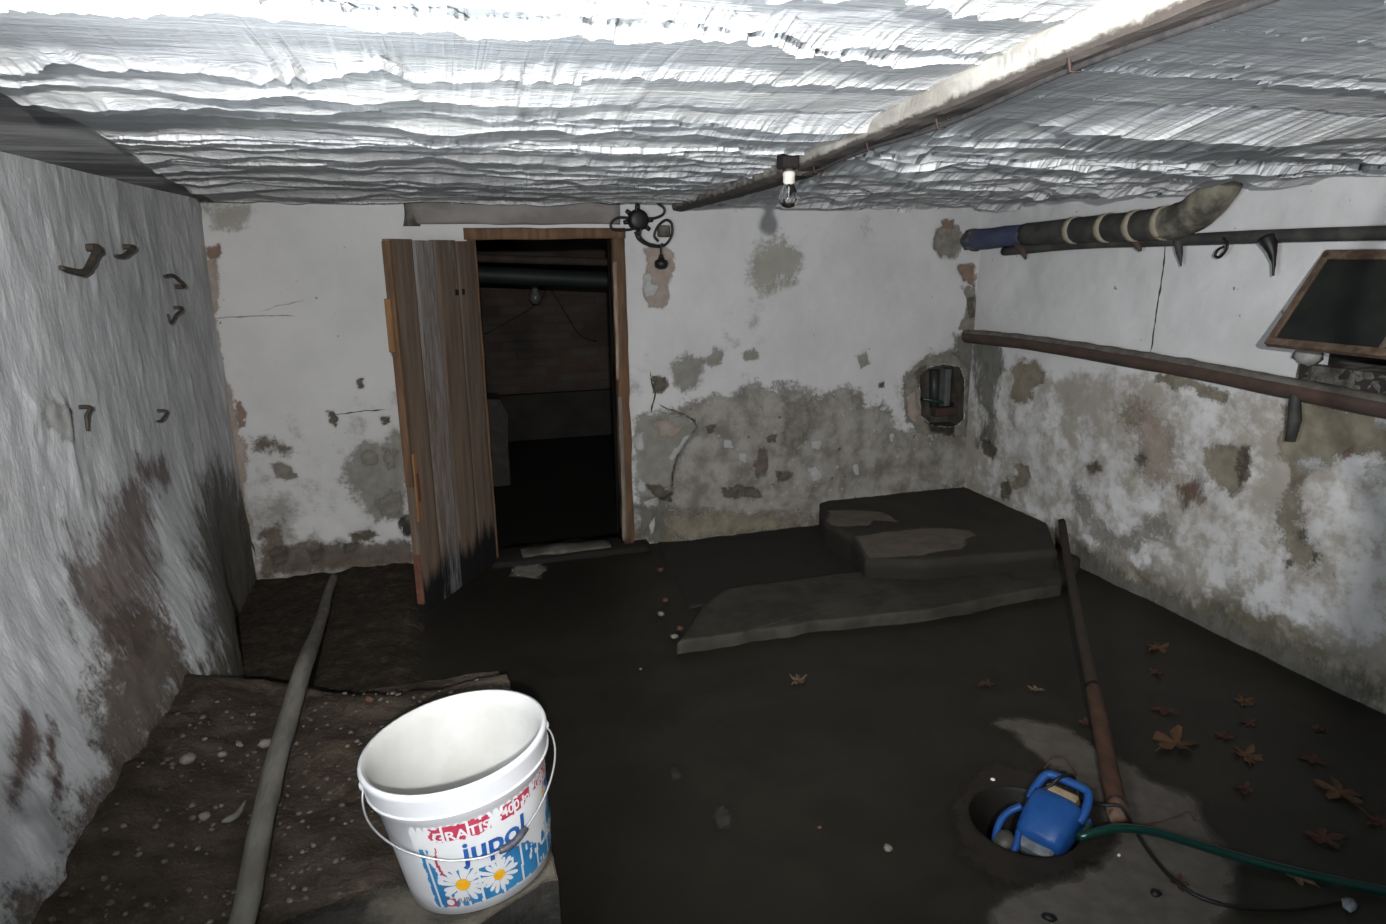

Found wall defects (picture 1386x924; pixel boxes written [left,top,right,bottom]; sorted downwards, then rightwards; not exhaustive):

peeling [643,244,675,308]
water stain [750,241,802,293]
spalling [933,219,977,331]
spalling [651,376,669,394]
spalling [903,350,997,459]
spalling [225,380,413,579]
water stain [340,430,409,524]
water stain [1086,459,1103,474]
spalling [1177,444,1252,508]
water stain [184,458,257,668]
water stain [1057,485,1384,711]
water stain [2,450,190,924]